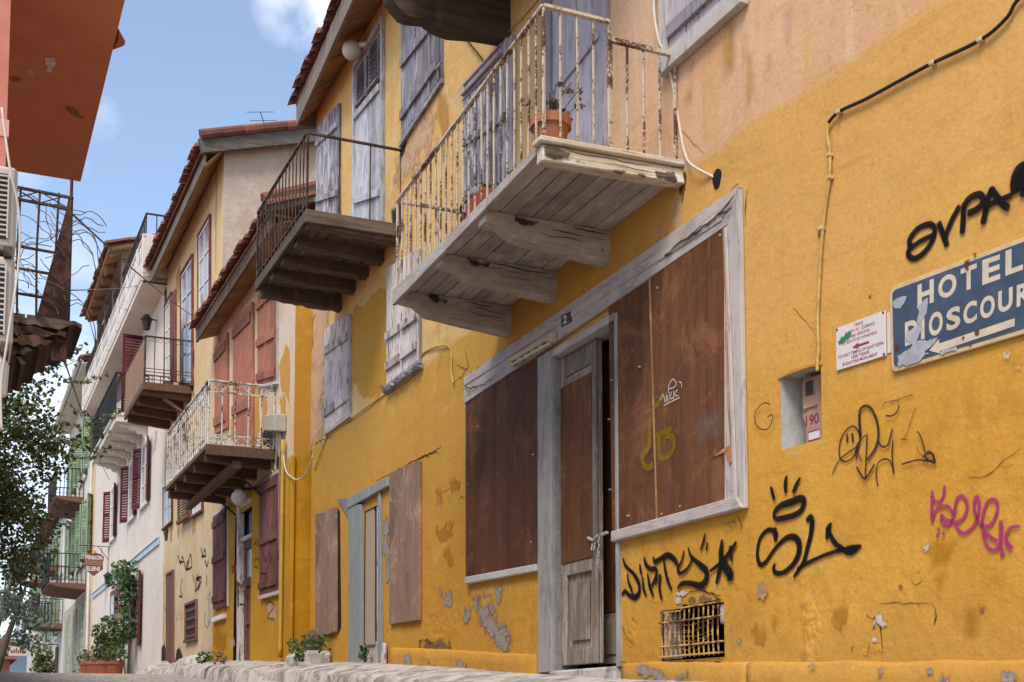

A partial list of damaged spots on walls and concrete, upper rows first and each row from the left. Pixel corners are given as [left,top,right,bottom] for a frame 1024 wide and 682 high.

peeling [310,309,329,456]
crack [436,351,496,397]
crack [376,447,440,481]
crack [969,447,1021,478]
peeling [435,521,454,568]
peeling [439,586,512,652]
spalling [635,589,724,681]